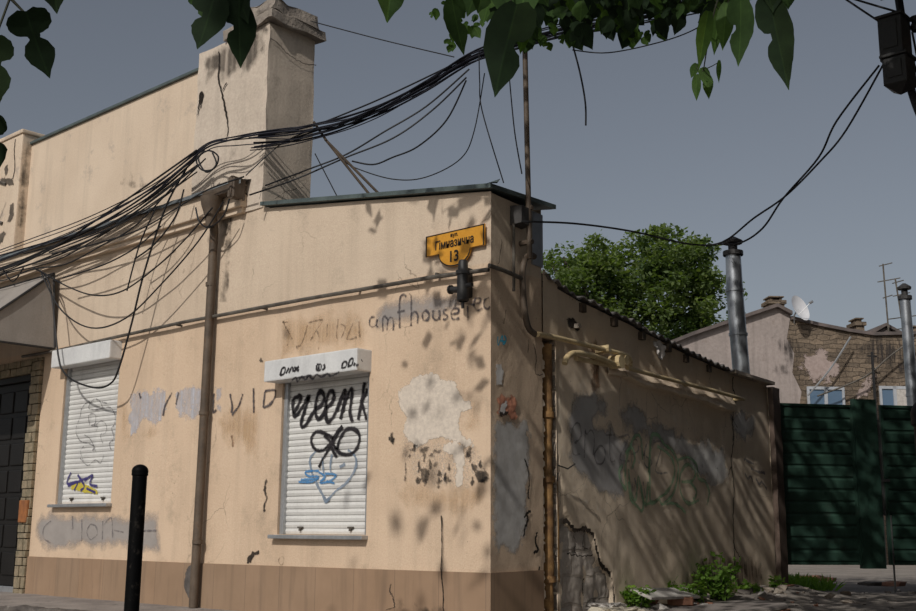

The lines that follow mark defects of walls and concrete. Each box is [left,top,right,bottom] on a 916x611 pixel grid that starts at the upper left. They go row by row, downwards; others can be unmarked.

crack [197,52,228,138]
flaking render [799,348,839,384]
peeling [398,372,474,487]
spalling [542,340,615,611]
crack [728,377,740,580]